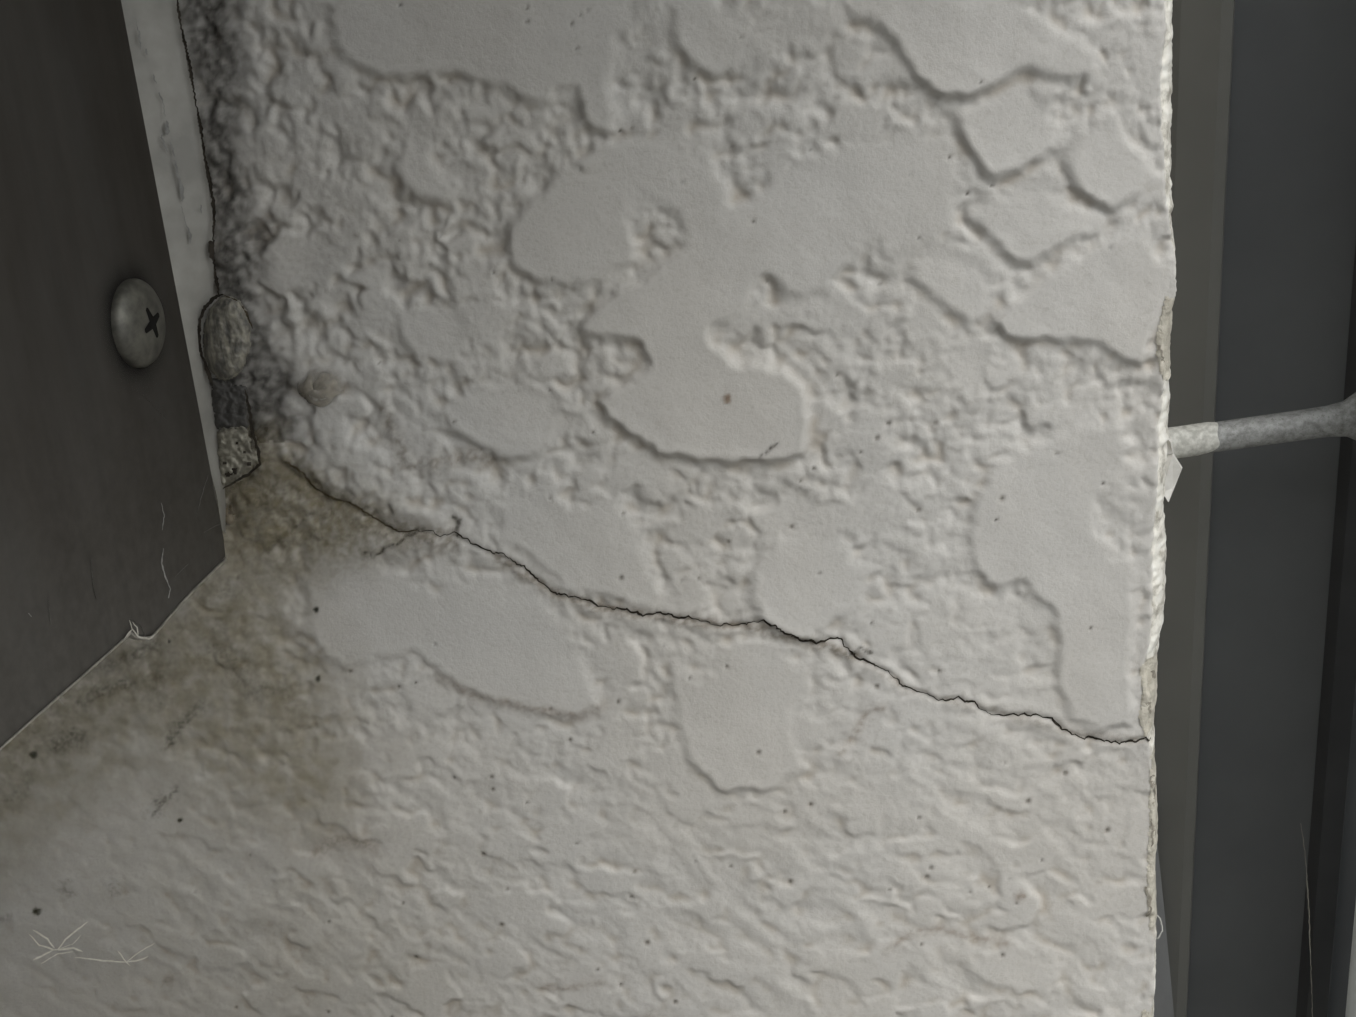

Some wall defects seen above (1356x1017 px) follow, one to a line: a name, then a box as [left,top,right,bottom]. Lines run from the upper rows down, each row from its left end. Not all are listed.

crack [285,462,1151,745]